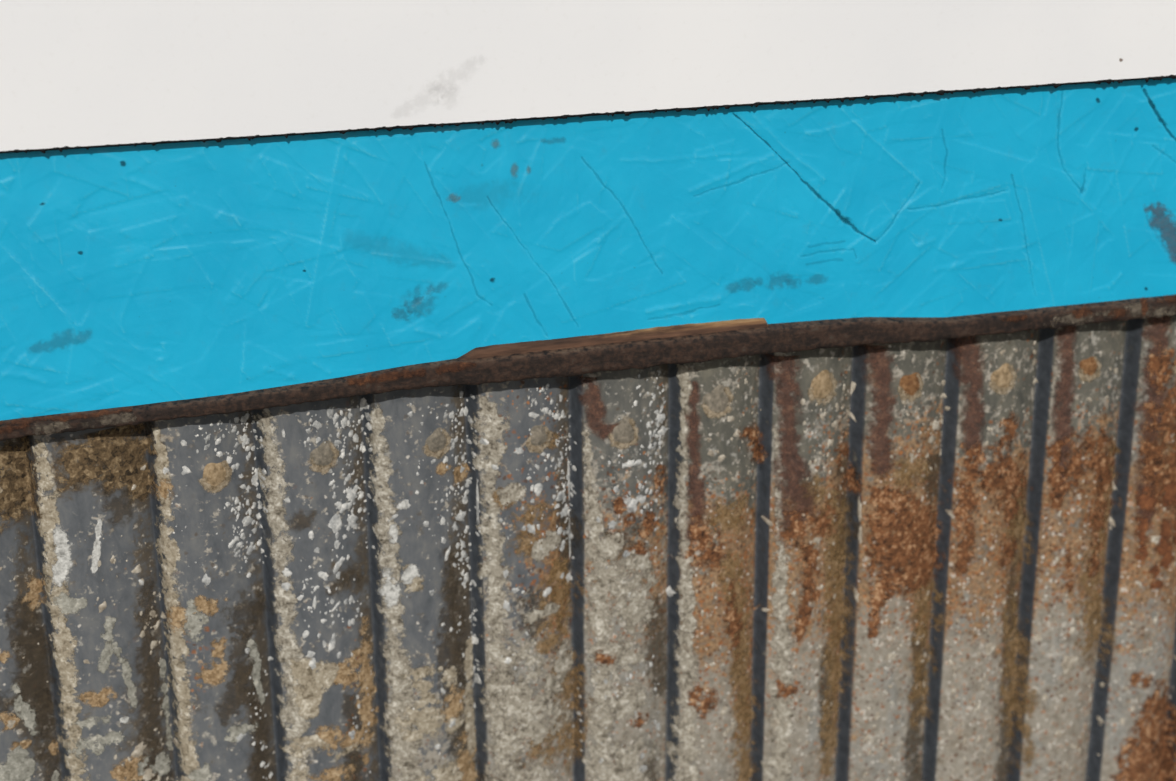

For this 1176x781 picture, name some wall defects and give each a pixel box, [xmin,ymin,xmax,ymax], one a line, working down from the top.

damp [0,598,61,781]
corrosion [0,408,132,433]
damp [0,422,162,533]
damp [136,580,173,781]
damp [217,595,269,781]
damp [343,695,363,781]
damp [438,549,484,781]
corrosion [683,381,757,781]
corrosion [738,336,1037,776]
corrosion [1047,306,1120,661]
corrosion [1112,672,1176,781]
corrosion [1134,295,1176,589]